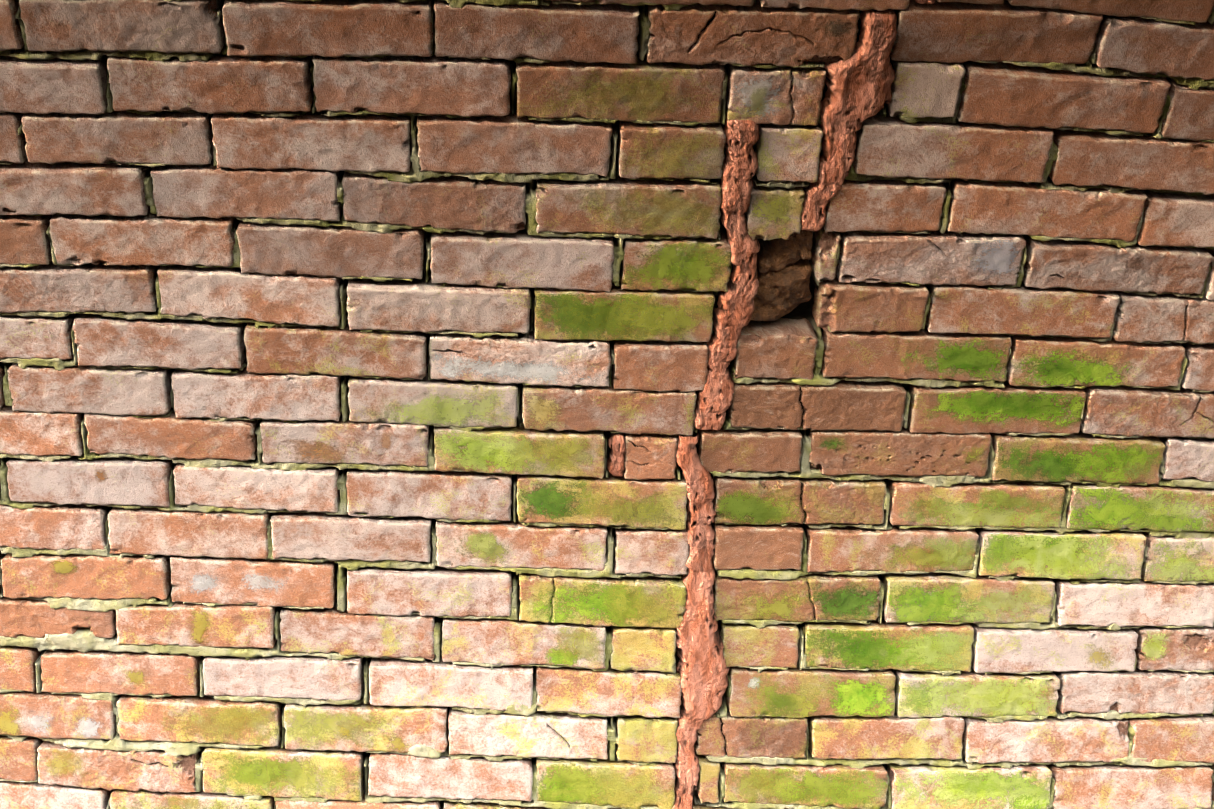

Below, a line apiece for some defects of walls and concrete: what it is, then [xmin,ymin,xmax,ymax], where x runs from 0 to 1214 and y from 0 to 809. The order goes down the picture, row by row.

crack [791,0,935,232]
spalling [738,230,837,343]
damp [436,356,563,381]
crack [798,387,806,426]
crack [607,433,638,477]
crack [672,115,760,809]
crack [799,482,807,522]